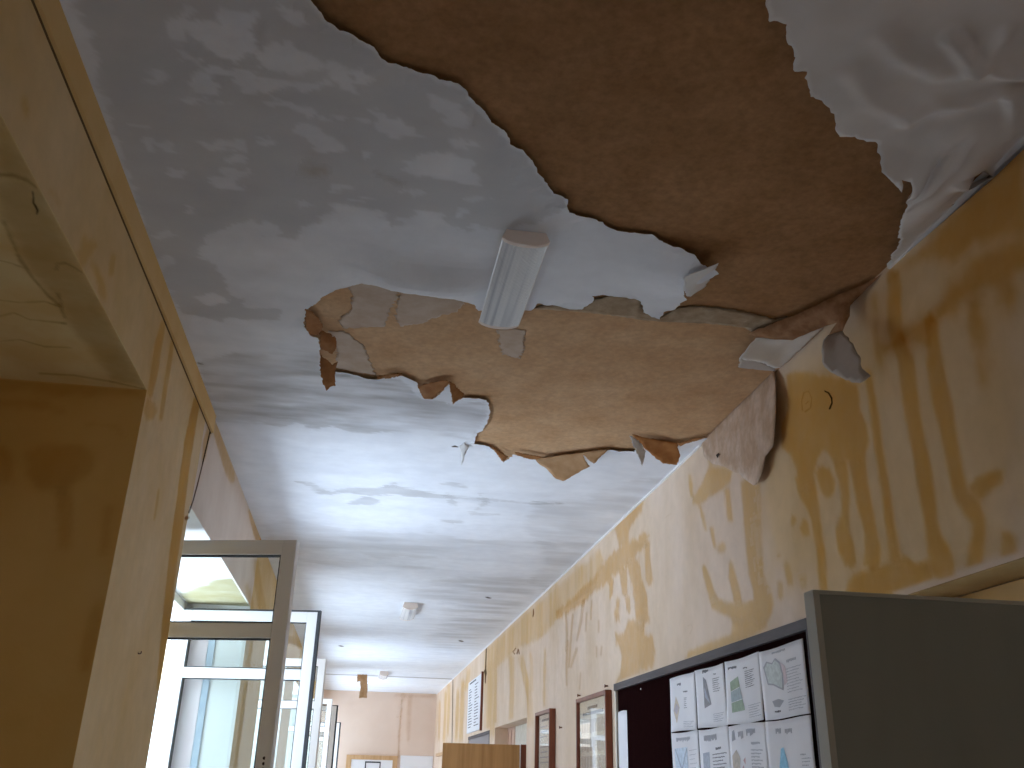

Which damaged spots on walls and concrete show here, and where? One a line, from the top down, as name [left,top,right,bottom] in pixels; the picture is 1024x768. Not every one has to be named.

peeling [303,0,912,485]